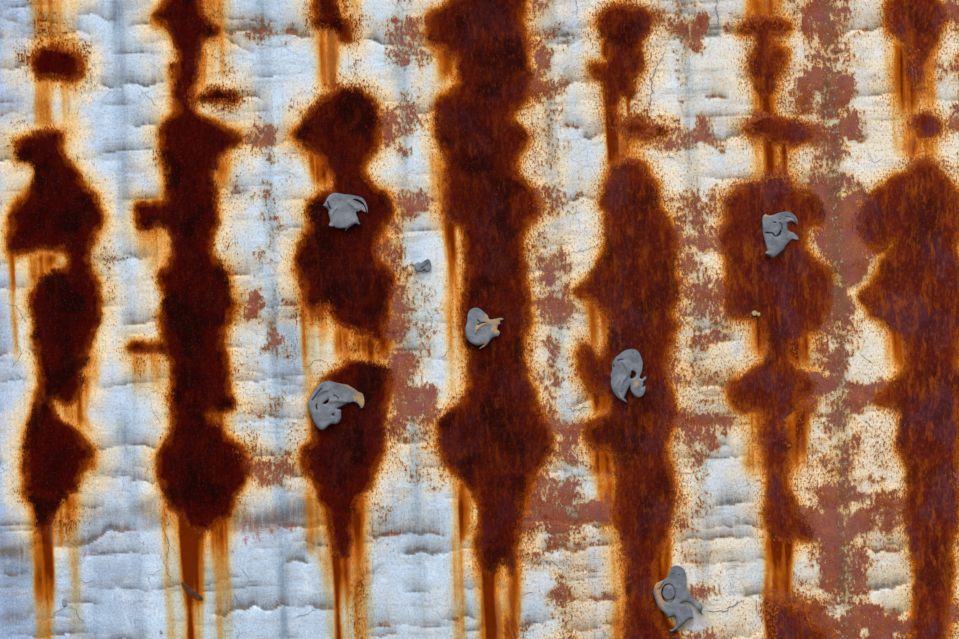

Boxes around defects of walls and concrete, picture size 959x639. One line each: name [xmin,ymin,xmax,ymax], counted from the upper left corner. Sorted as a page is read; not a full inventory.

corrosion [245,16,286,45]
corrosion [252,178,285,266]
corrosion [2,0,132,607]
corrosion [260,310,297,364]
corrosion [545,570,582,639]
corrosion [689,581,721,602]